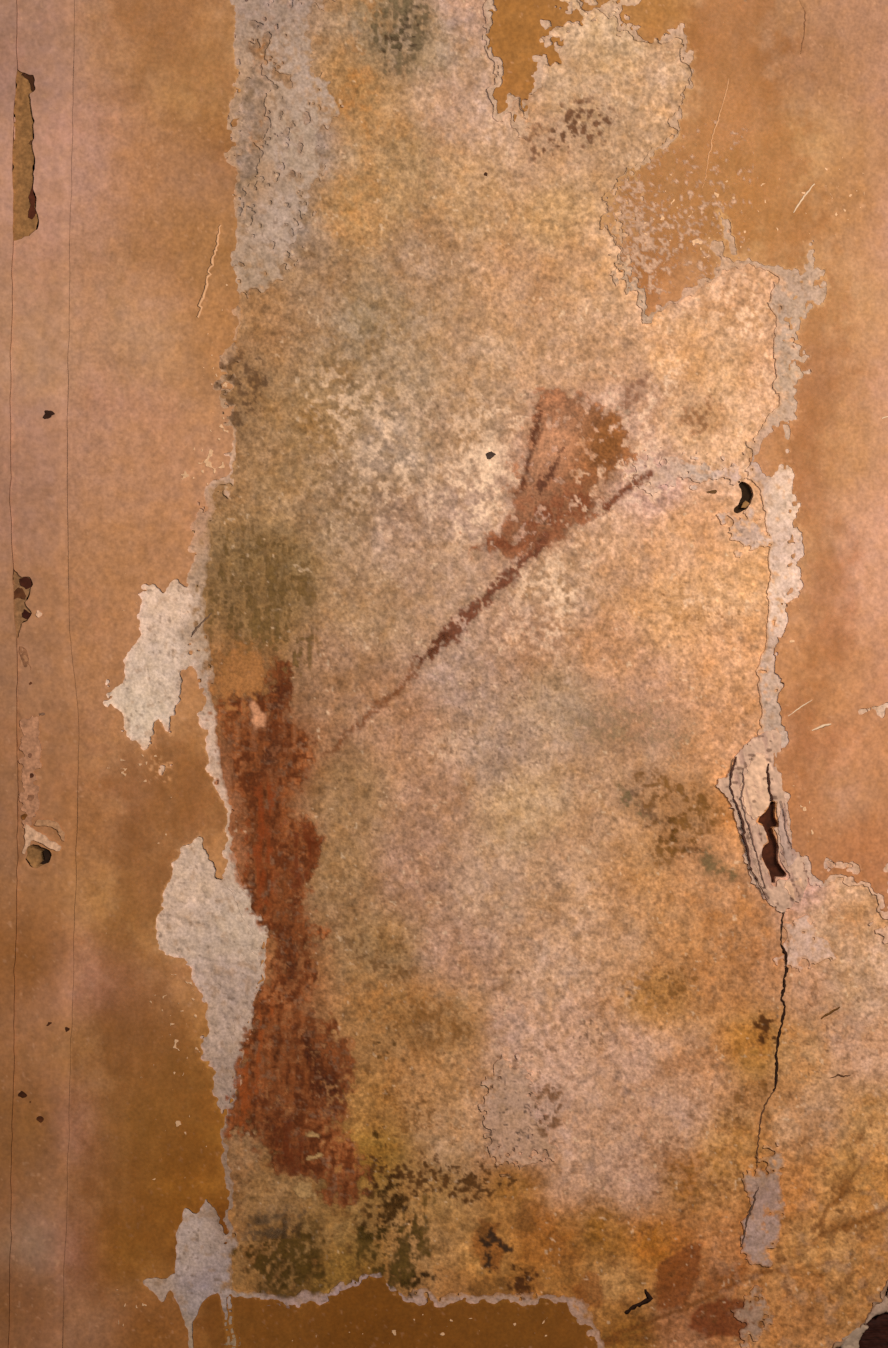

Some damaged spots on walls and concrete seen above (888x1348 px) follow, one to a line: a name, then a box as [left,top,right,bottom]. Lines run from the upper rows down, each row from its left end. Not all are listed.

peeling [12,70,39,241]
flaking render [103,579,191,750]
water stain [209,526,315,670]
peeling [180,0,888,1348]
flaking render [156,836,267,1110]
rust [209,643,374,1208]
crack [741,912,789,1247]
flaking render [143,1199,225,1348]
water stain [233,1232,329,1297]
water stain [357,1126,517,1288]